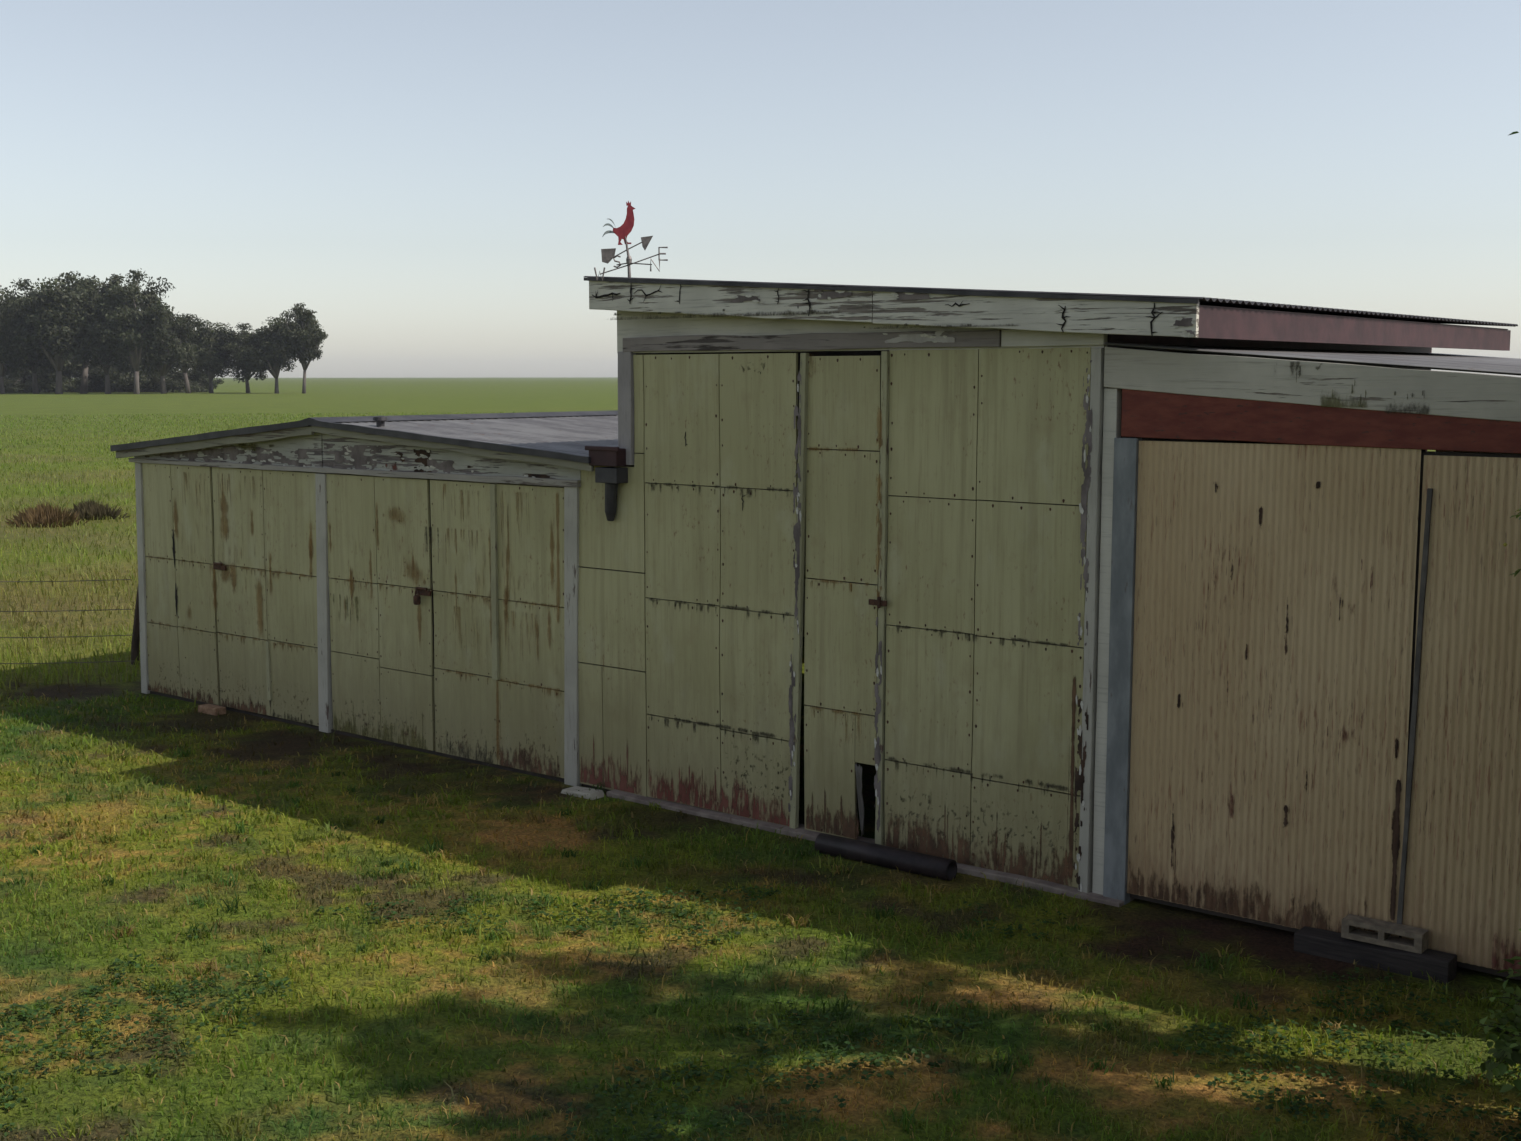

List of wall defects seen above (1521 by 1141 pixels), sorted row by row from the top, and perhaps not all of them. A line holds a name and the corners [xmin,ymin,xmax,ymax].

peeling [731,289,760,303]
peeling [1170,316,1196,337]
peeling [145,443,474,473]
peeling [1077,360,1092,646]
corrosion [213,526,312,648]
corrosion [532,494,559,656]
corrosion [441,680,560,777]
corrosion [581,738,859,839]
corrosion [886,677,1076,886]
corrosion [1128,804,1375,933]